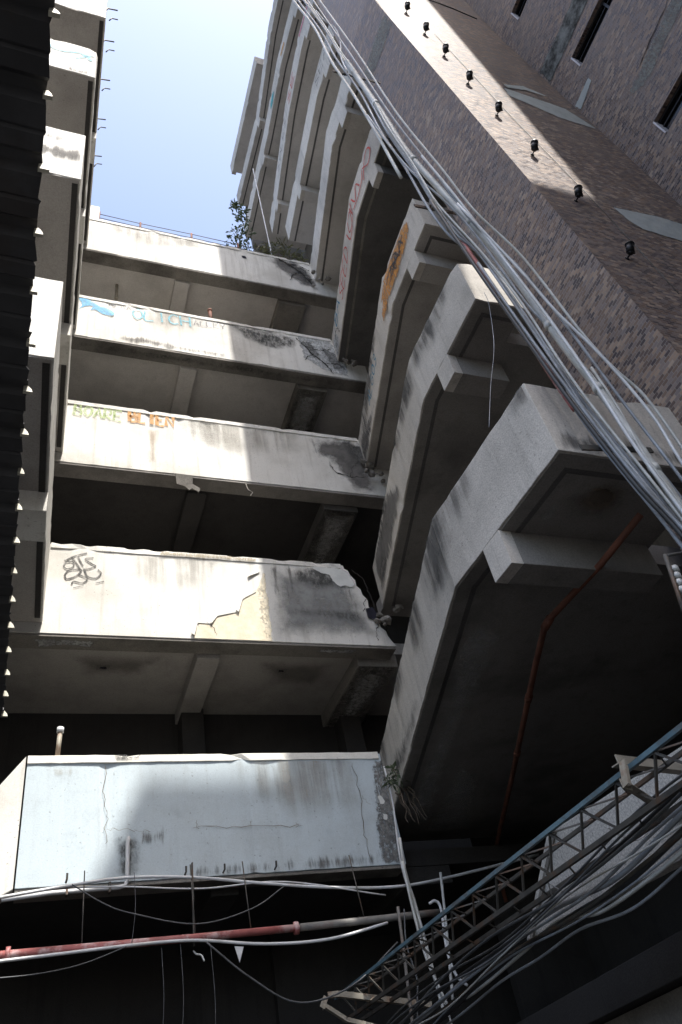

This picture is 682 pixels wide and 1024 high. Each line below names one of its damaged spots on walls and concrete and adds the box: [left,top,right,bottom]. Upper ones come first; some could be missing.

spalling [298,333,357,375]
water stain [273,510,377,630]
peeling [311,567,354,587]
crack [102,767,150,844]
crack [194,820,302,828]
spalling [373,761,401,863]
water stain [120,835,151,873]